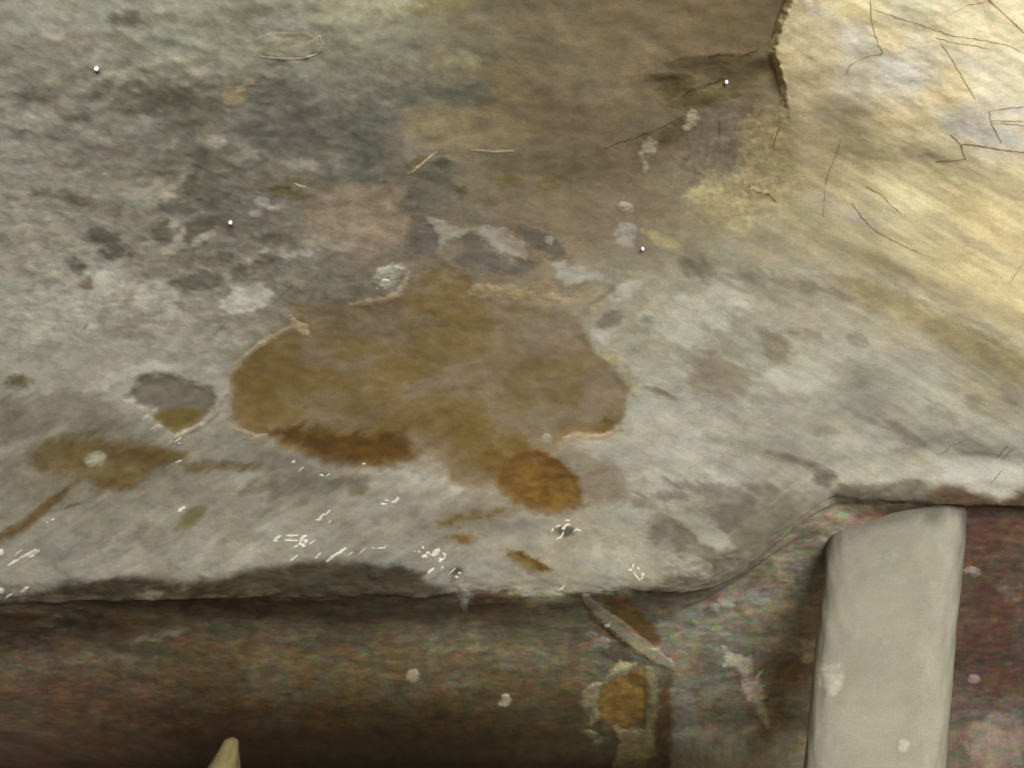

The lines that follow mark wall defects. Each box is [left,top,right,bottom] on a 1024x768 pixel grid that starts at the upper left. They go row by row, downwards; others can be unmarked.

water stain [427,79,500,108]
crack [604,0,785,149]
crack [847,0,1024,162]
water stain [639,36,809,227]
water stain [390,152,471,260]
water stain [466,220,569,279]
crack [852,187,923,255]
water stain [152,403,208,435]
spalling [600,588,668,651]